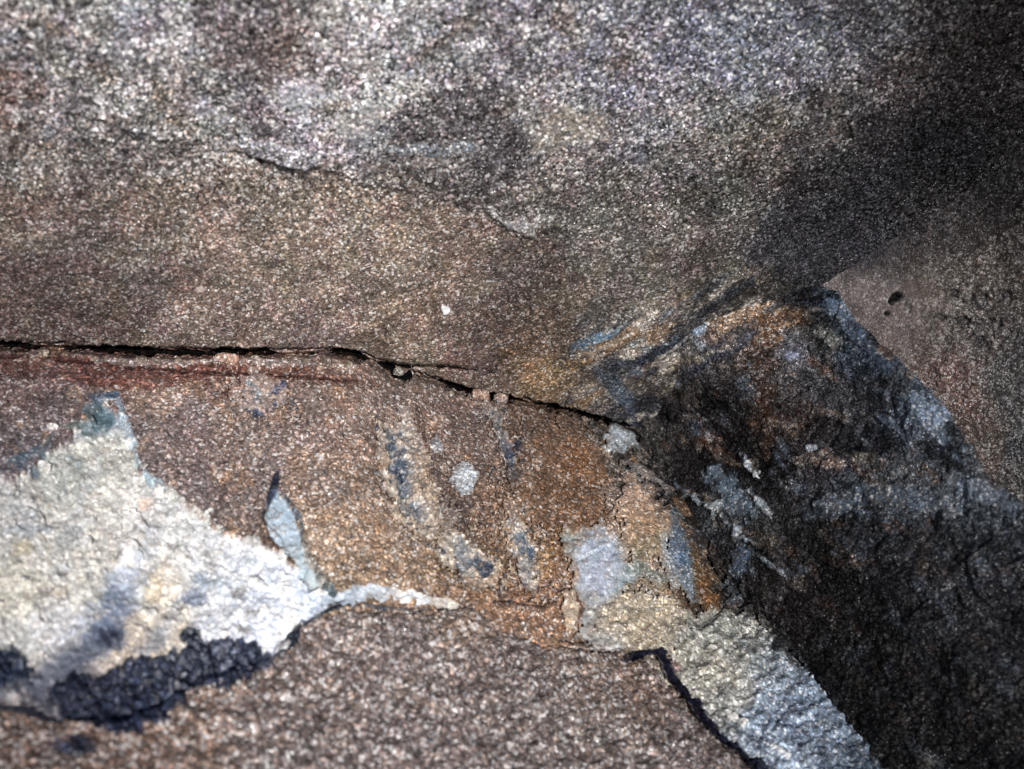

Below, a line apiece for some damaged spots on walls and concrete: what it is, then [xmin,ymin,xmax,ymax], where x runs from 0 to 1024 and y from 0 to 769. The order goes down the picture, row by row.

rust [0,349,387,393]
crack [0,340,647,443]
rust [494,354,620,580]
damp [570,322,813,585]
damp [656,275,896,375]
damp [790,466,1022,526]
efflorescence [908,390,953,448]
spalling [0,389,883,769]
efflorescence [657,514,699,604]
damp [913,581,964,615]
crack [621,647,769,769]